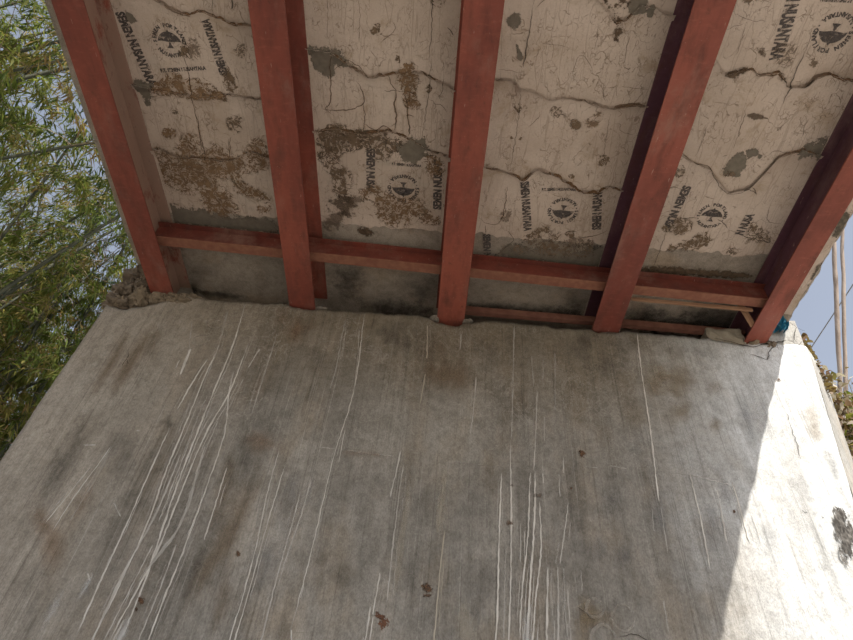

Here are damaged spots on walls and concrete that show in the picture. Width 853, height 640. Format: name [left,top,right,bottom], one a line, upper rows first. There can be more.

peeling [132,67,238,106]
peeling [308,45,351,79]
crack [325,0,453,134]
crack [501,0,598,73]
peeling [604,0,656,42]
crack [784,37,811,100]
peeling [154,127,279,233]
peeling [316,124,445,227]
crack [696,116,757,195]
peeling [723,149,762,177]
peeling [662,217,713,252]
damp [376,303,433,358]